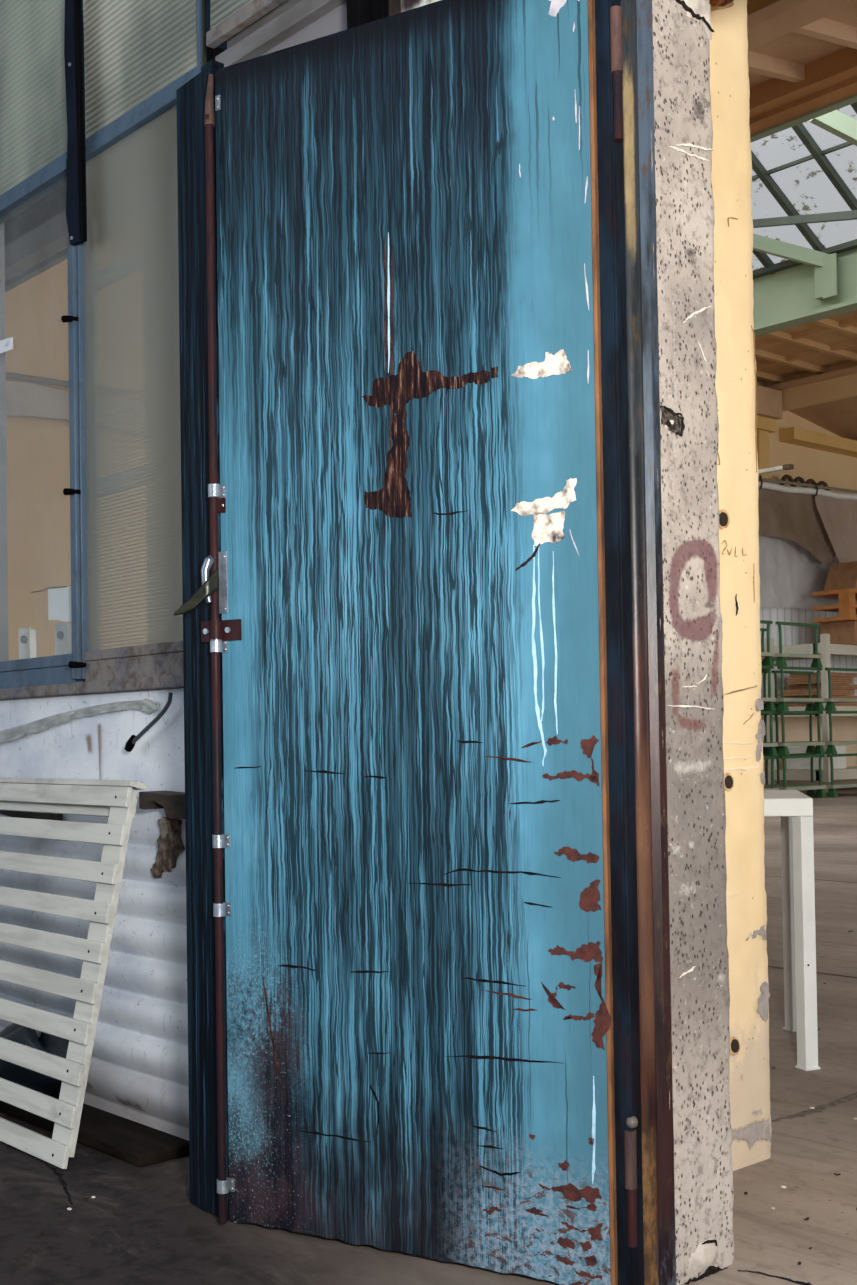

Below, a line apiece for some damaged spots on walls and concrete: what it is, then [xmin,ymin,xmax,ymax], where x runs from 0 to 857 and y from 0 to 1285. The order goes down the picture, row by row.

peeling [548,0,580,17]
peeling [362,349,589,518]
peeling [511,478,579,555]
corrosion [542,735,600,786]
corrosion [554,846,599,863]
corrosion [579,879,601,912]
corrosion [541,941,611,1050]
spalling [757,981,770,1022]
crack [771,1092,857,1122]
peeling [732,1110,771,1146]
corrosion [538,1160,603,1285]
crack [738,1270,812,1285]